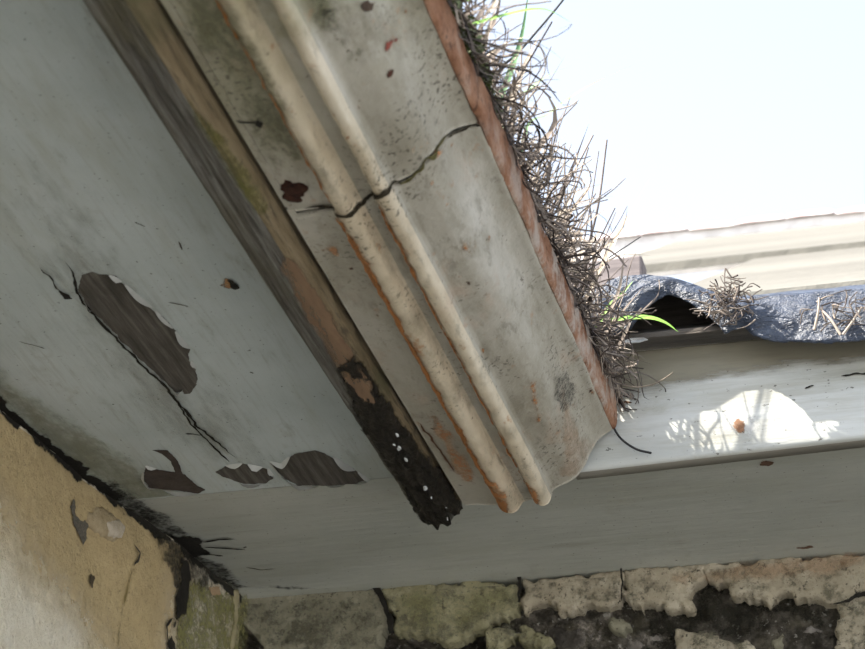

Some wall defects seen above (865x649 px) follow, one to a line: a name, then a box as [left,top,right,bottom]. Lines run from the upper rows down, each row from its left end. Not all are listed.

rust [215,0,330,203]
crack [305,124,480,218]
peeling [78,272,198,396]
rust [335,203,508,513]
peeling [141,450,205,497]
peeling [216,450,370,490]
rust [499,435,539,504]
spalling [70,499,125,544]
water stain [0,396,244,649]
peeling [626,633,663,649]
peeling [771,634,784,649]